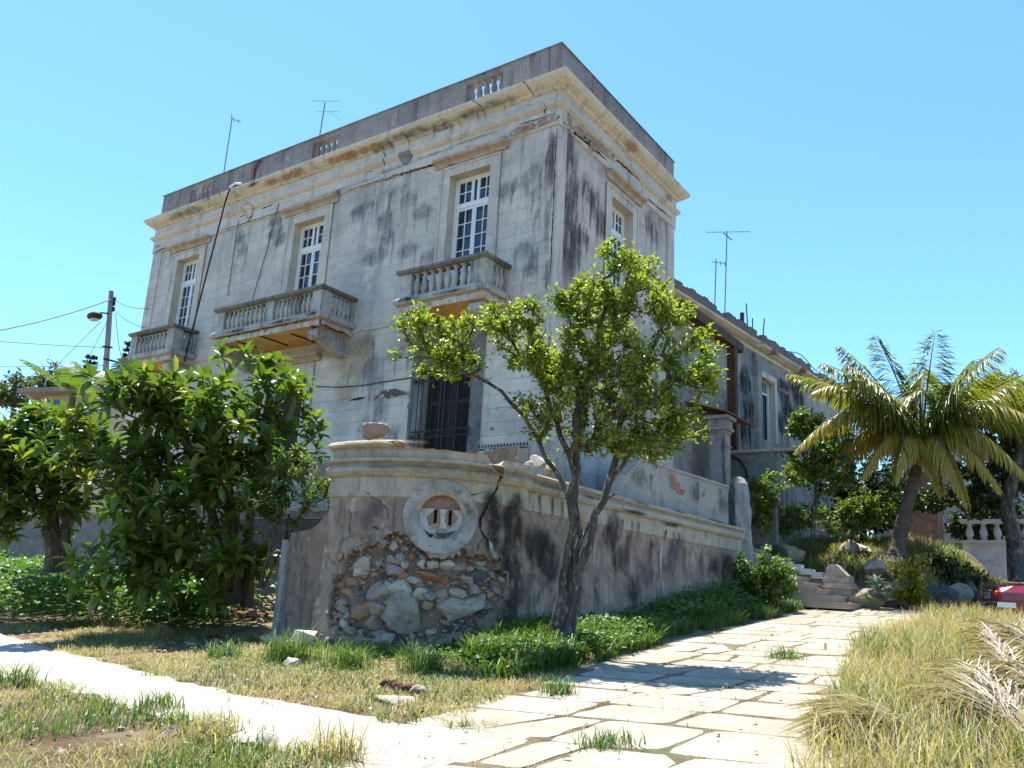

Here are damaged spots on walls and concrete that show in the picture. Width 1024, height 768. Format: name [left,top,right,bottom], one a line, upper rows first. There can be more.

flaking render [507,115,617,162]
water stain [545,131,606,273]
crack [521,81,670,290]
flaking render [330,533,506,648]
crack [454,475,503,551]
water stain [483,493,560,628]
water stain [594,510,644,567]
water stain [629,522,682,604]
flaking render [669,473,685,495]